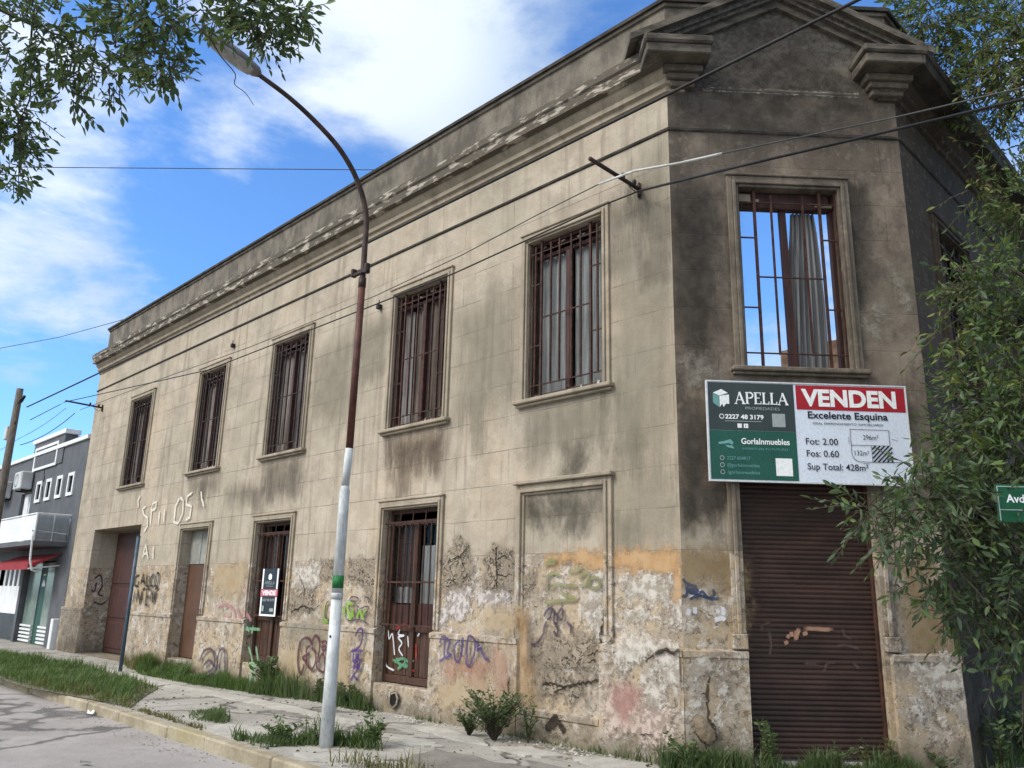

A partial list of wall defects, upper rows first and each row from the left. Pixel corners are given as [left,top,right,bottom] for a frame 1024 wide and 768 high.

damp [672,186,722,366]
damp [849,186,867,301]
damp [678,406,727,525]
flaking render [347,557,382,608]
crack [495,547,513,587]
peeling [279,642,305,680]
peeling [337,637,351,692]
peeling [435,535,731,760]
crack [646,647,679,662]
peeling [894,559,968,726]
crack [695,676,718,750]